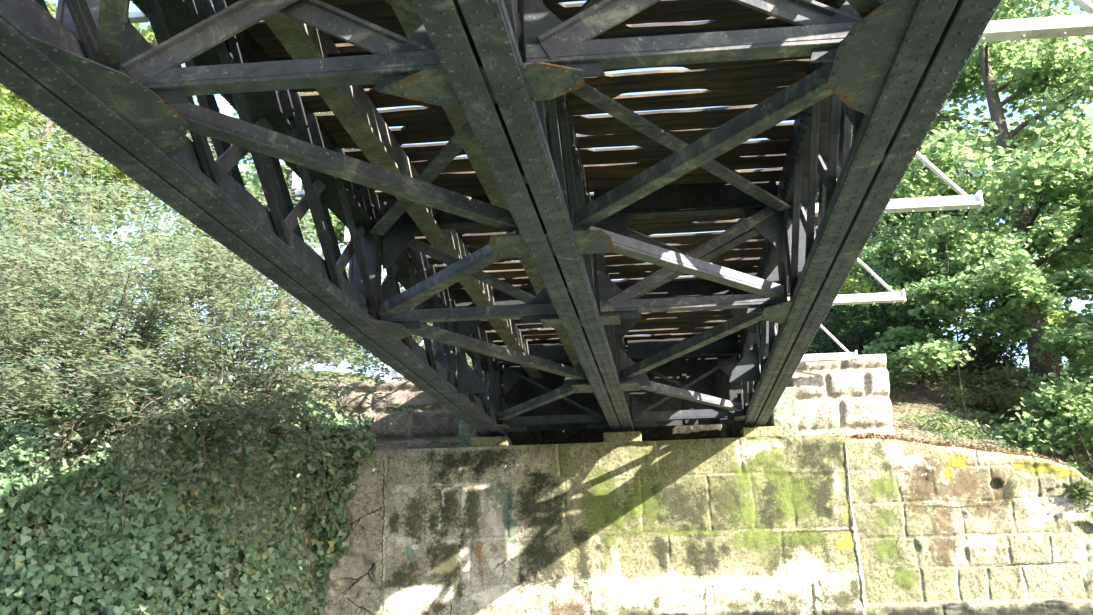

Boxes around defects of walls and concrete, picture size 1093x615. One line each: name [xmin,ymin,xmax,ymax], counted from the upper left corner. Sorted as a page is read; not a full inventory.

crack [340,460,389,615]
leakage [379,462,687,615]
leakage [682,504,739,541]
leakage [904,491,997,570]
leakage [1001,481,1051,528]
leakage [658,544,875,615]
leakage [889,600,1093,615]